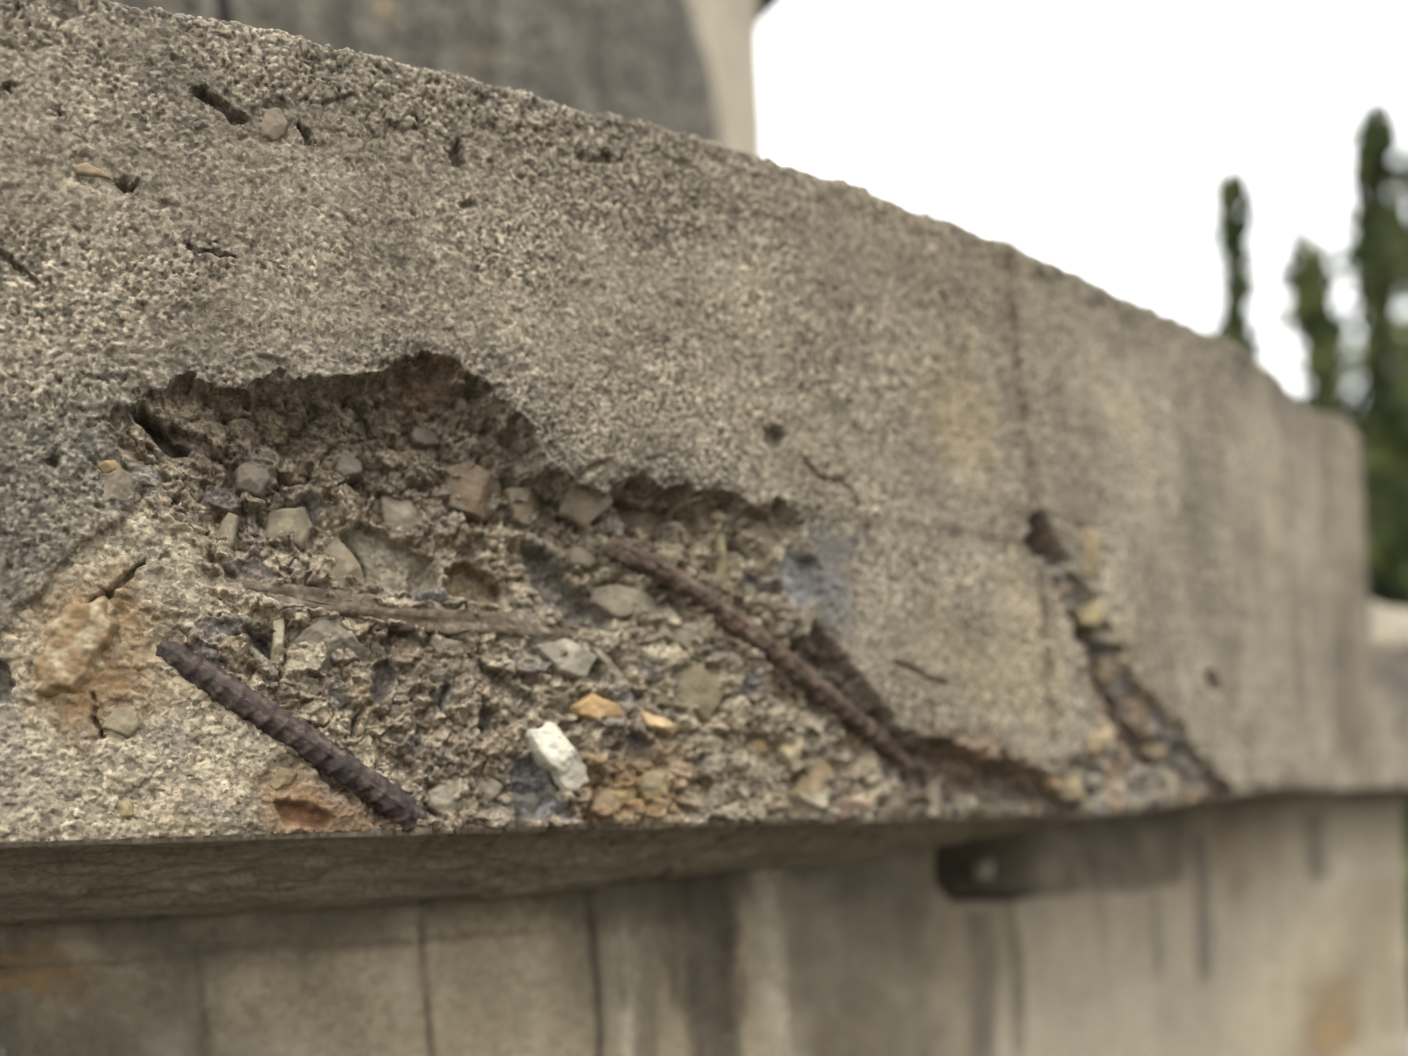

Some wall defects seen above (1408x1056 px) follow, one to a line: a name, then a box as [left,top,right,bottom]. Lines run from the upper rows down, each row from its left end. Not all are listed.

rust [276,790,333,827]
spalling [0,351,1188,903]
crack [1003,241,1235,815]